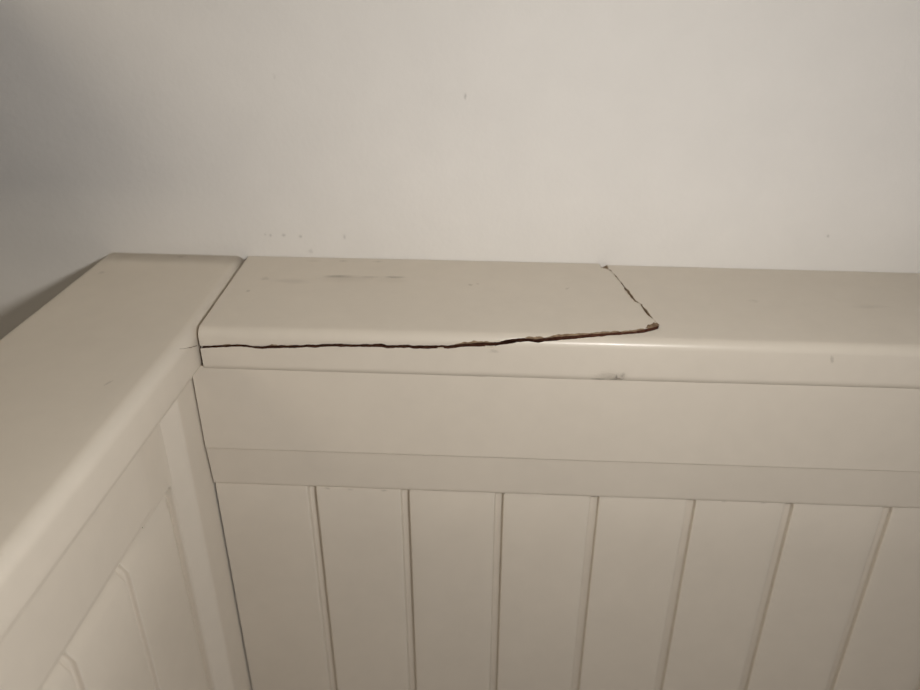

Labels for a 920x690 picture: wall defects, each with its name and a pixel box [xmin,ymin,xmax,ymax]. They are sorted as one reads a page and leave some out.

crack [184,265,659,349]